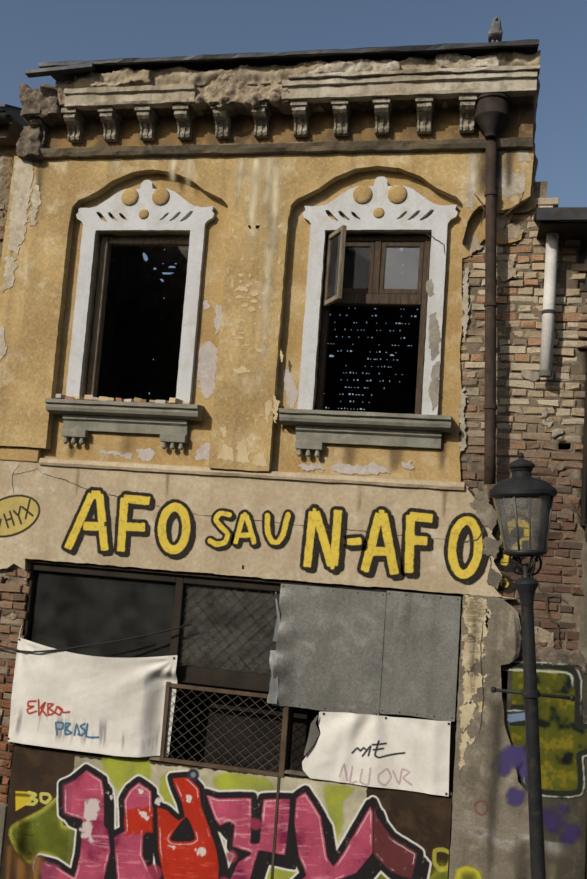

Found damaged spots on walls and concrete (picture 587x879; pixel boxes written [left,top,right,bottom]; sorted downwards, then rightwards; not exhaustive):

flaking render [90,67,153,88]
flaking render [303,58,400,74]
flaking render [436,52,499,68]
flaking render [0,159,42,292]
peeling [196,300,222,399]
peeling [428,312,441,410]
peeling [265,350,299,423]
crack [12,466,86,492]
peeling [195,427,268,467]
flaking render [299,461,390,475]
flaking render [534,626,587,674]
peeling [458,595,491,784]